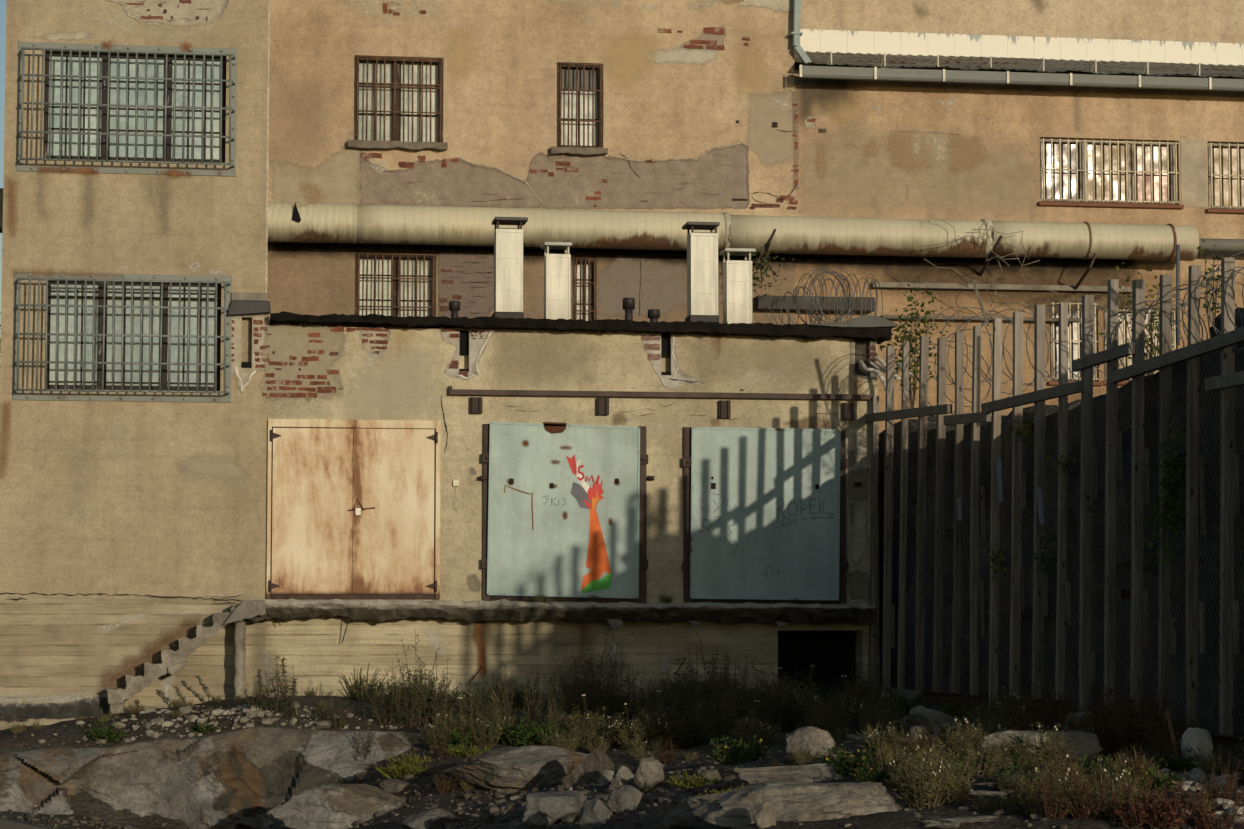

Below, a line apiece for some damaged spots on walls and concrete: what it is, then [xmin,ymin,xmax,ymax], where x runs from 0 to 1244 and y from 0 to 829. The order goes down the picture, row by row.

flaking render [109,0,230,27]
flaking render [265,0,826,293]
flaking render [231,314,392,399]
flaking render [432,252,495,380]
flaking render [619,335,706,433]
rust [474,621,486,675]